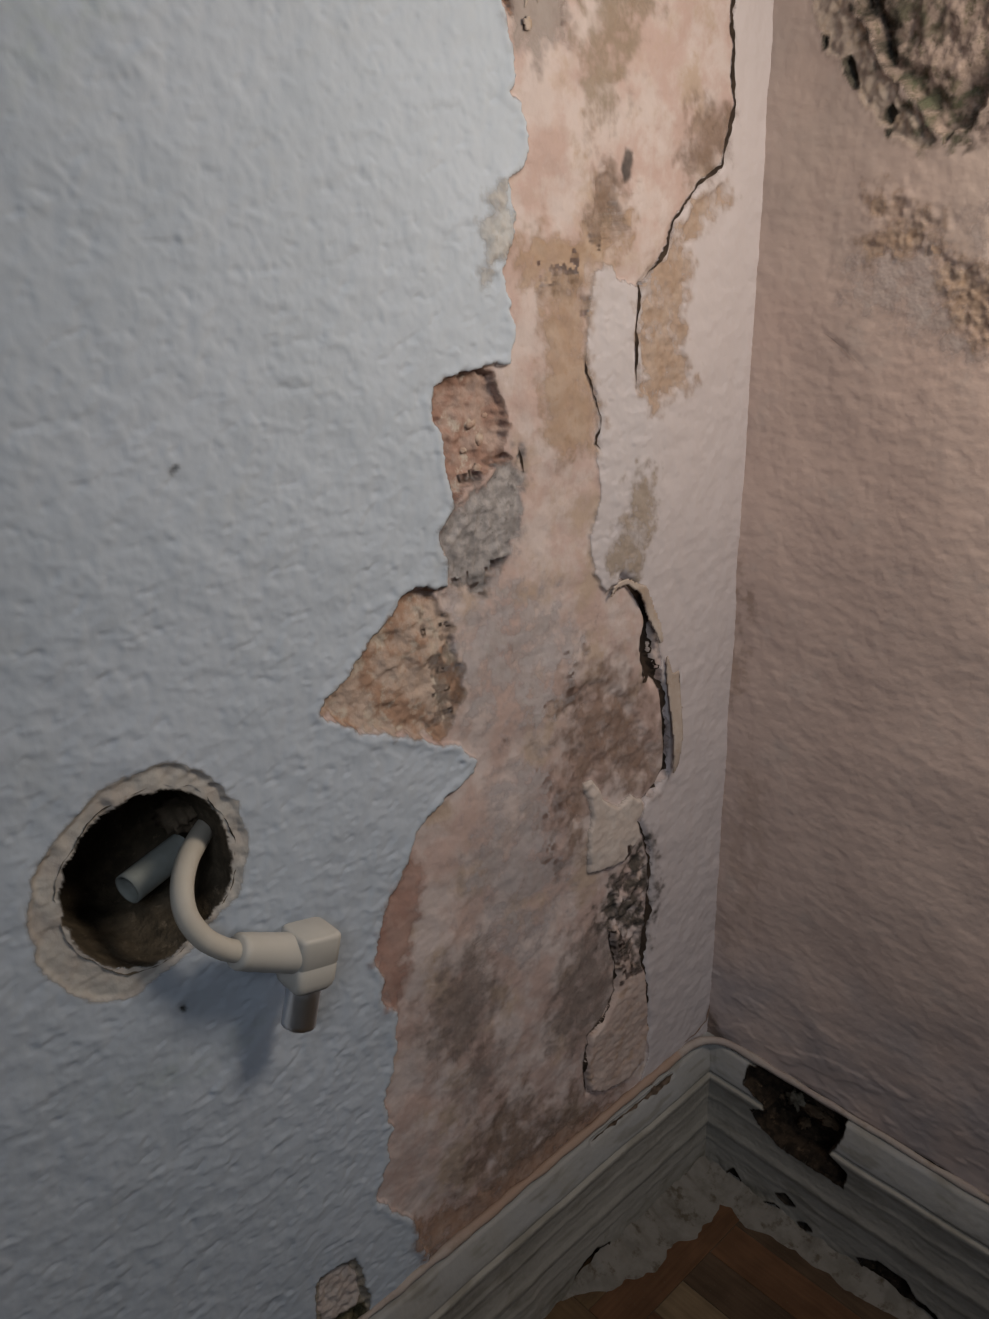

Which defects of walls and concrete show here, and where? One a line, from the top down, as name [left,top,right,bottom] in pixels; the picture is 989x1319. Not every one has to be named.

damp [814,0,936,149]
flaking render [848,0,989,150]
crack [635,0,736,384]
flaking render [431,368,513,503]
crack [585,362,602,448]
flaking render [320,588,467,741]
peeling [611,578,683,773]
damp [428,453,663,1056]
crack [583,578,680,1090]
damp [463,1091,588,1192]
spalling [743,1065,848,1189]
peeling [561,1156,934,1319]